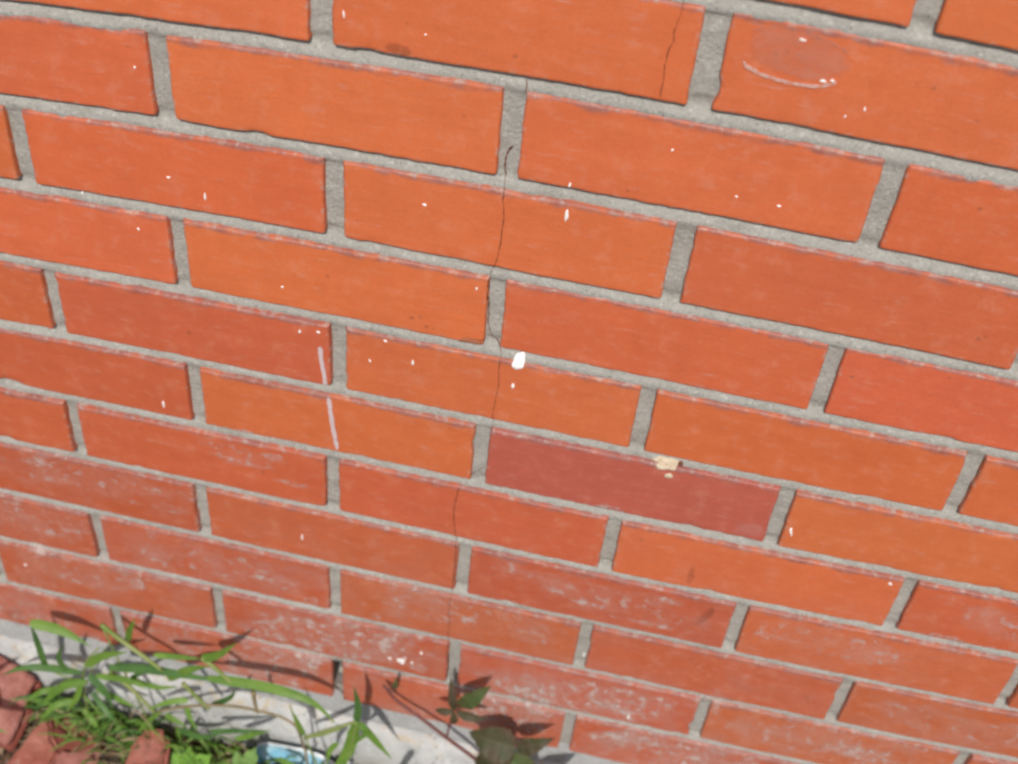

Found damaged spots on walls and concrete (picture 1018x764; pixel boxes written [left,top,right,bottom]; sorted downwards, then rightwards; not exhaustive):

crack [660,4,683,100]
crack [446,145,514,678]